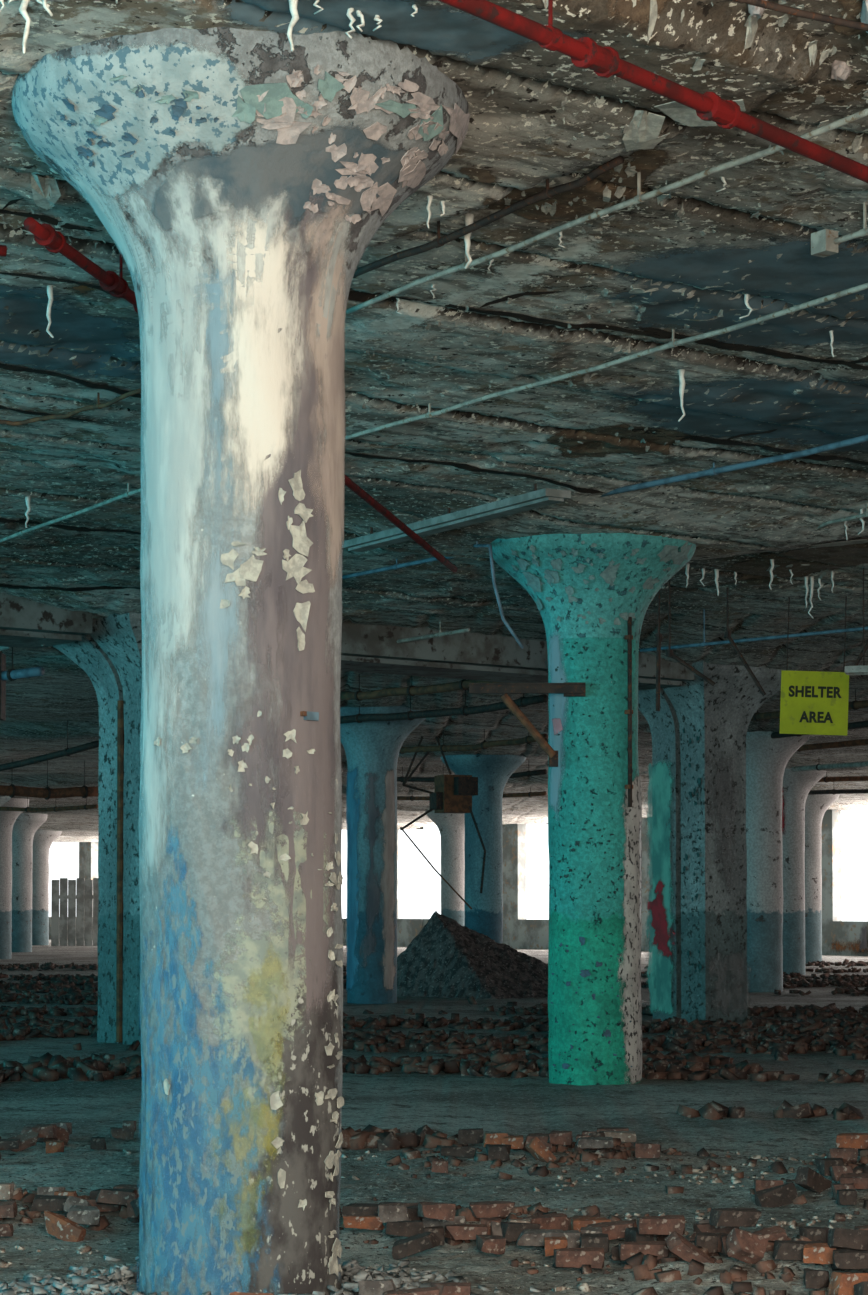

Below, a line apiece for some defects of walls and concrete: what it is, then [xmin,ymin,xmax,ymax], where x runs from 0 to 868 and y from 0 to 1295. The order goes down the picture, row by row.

water stain [0,0,37,34]
water stain [222,0,534,61]
peeling [1,42,717,262]
crack [348,291,868,370]
peeling [220,541,267,609]
peeling [278,470,315,651]
peeling [228,729,343,912]